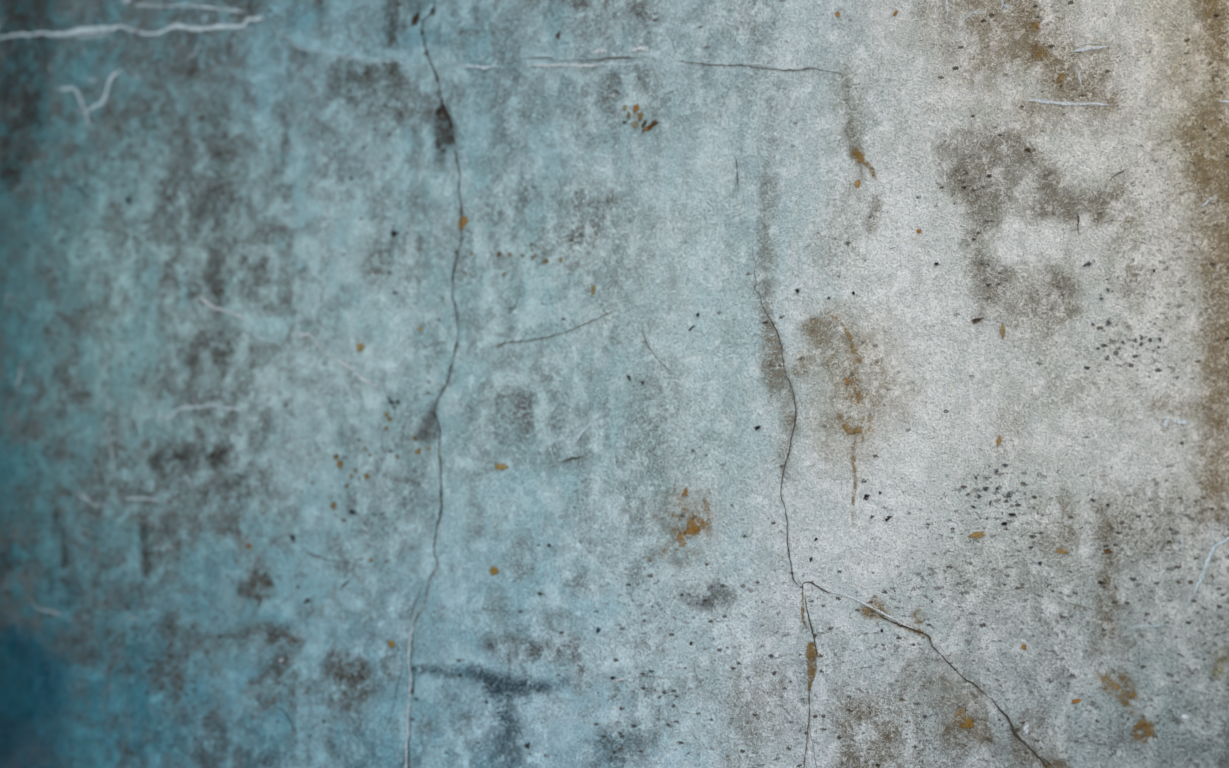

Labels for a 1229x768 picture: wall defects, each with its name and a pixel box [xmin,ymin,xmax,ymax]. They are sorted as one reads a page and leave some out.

corrosion [623,104,658,134]
leakage [1183,0,1229,301]
crack [0,0,840,768]
corrosion [671,488,710,546]
corrosion [840,378,871,516]
crack [752,248,1052,768]
leakage [1203,324,1229,422]